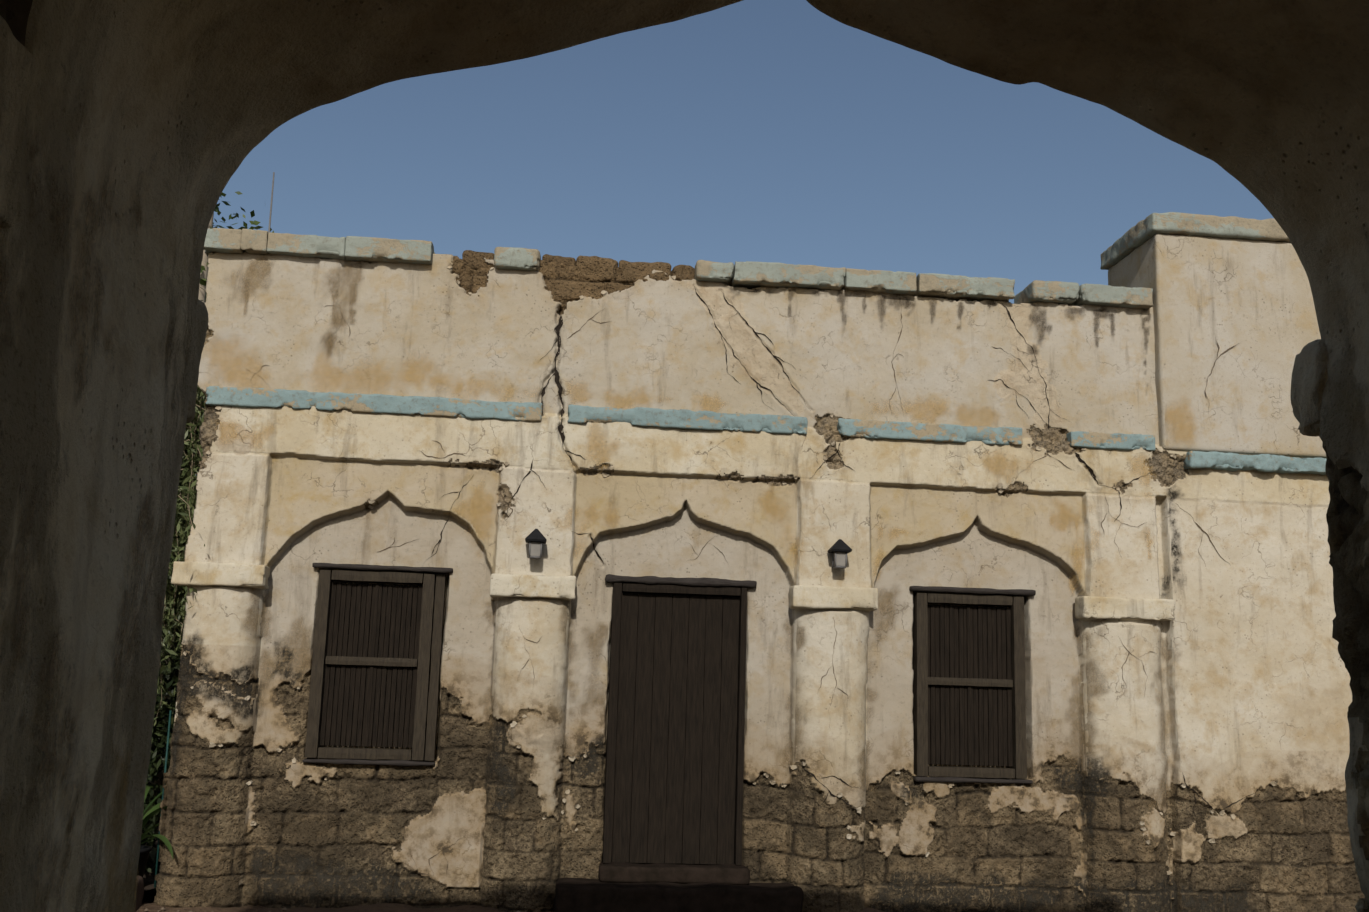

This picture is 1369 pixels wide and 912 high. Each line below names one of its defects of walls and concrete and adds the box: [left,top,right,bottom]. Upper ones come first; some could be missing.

flaking render [447,250,495,297]
flaking render [539,254,695,315]
crack [379,440,547,559]
crack [540,312,610,464]
crack [574,532,603,562]
crack [693,285,811,414]
flaking render [814,413,850,469]
flaking render [1026,423,1086,456]
crack [987,304,1153,550]
flaking render [742,446,1369,912]
flaking render [154,643,607,912]